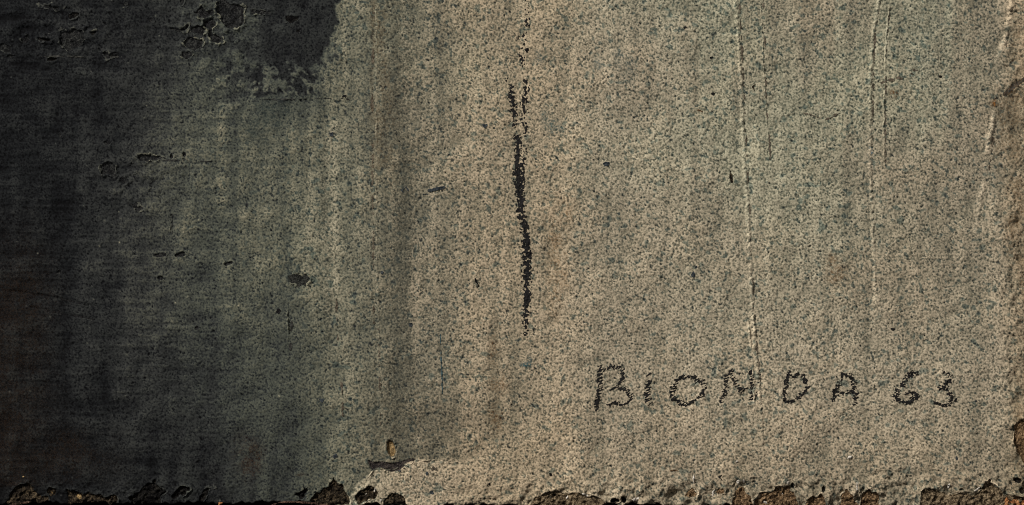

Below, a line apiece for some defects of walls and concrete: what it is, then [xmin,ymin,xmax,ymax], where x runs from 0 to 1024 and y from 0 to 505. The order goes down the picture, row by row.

peeling [170,0,271,59]
crack [738,0,771,214]
spalling [295,439,465,505]
spalling [7,480,217,505]
spalling [531,489,621,505]
spalling [716,482,881,505]
spalling [920,478,1024,505]